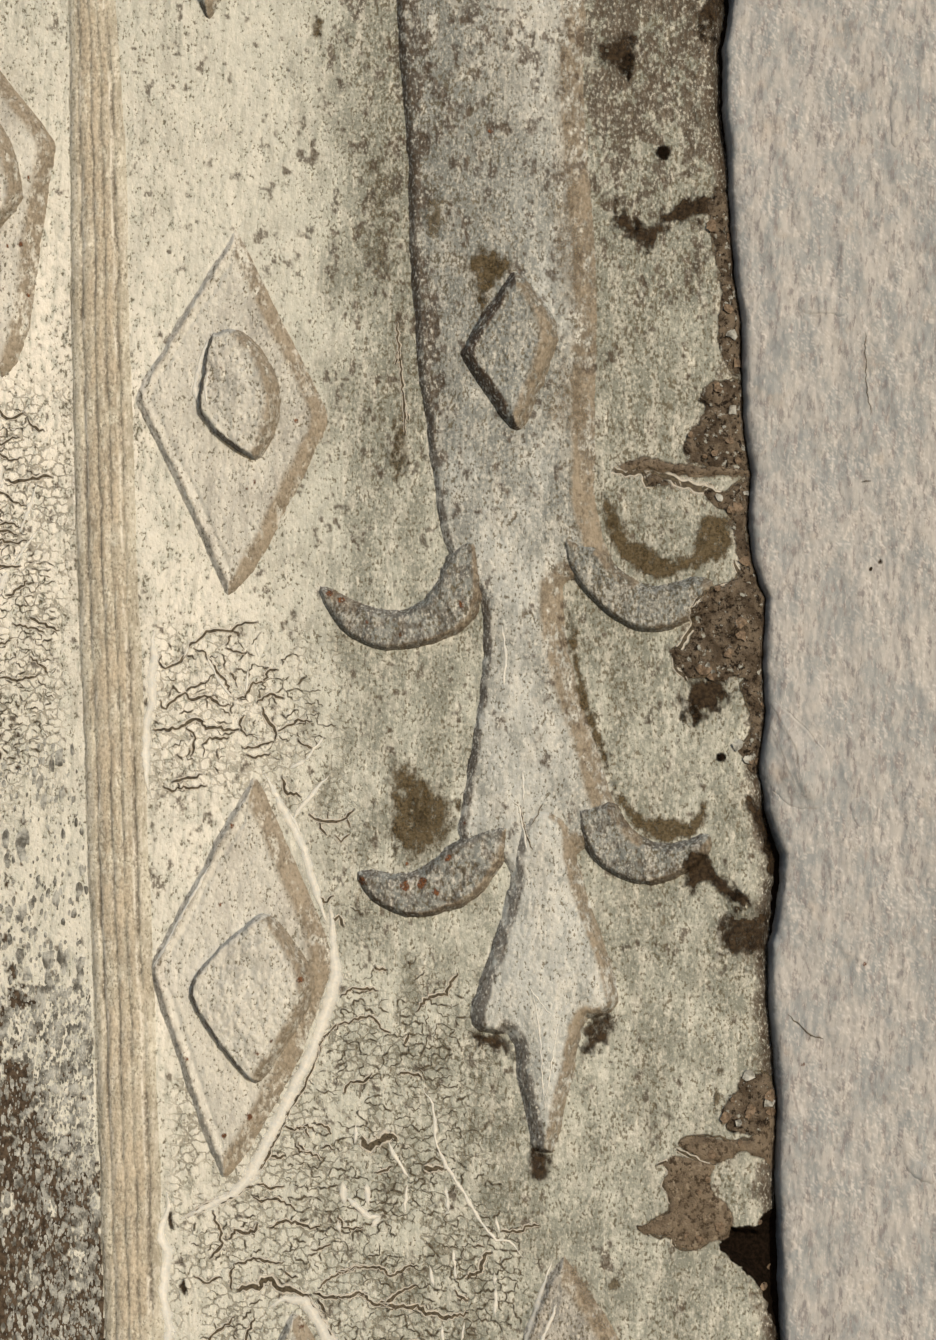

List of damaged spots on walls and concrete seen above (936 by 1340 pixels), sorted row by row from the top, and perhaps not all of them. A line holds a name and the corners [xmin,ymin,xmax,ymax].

damp [614,187,718,254]
crack [0,409,60,771]
spalling [620,189,766,774]
crack [153,621,355,843]
crack [320,895,363,928]
crack [187,956,549,1340]
spalling [636,1069,778,1326]